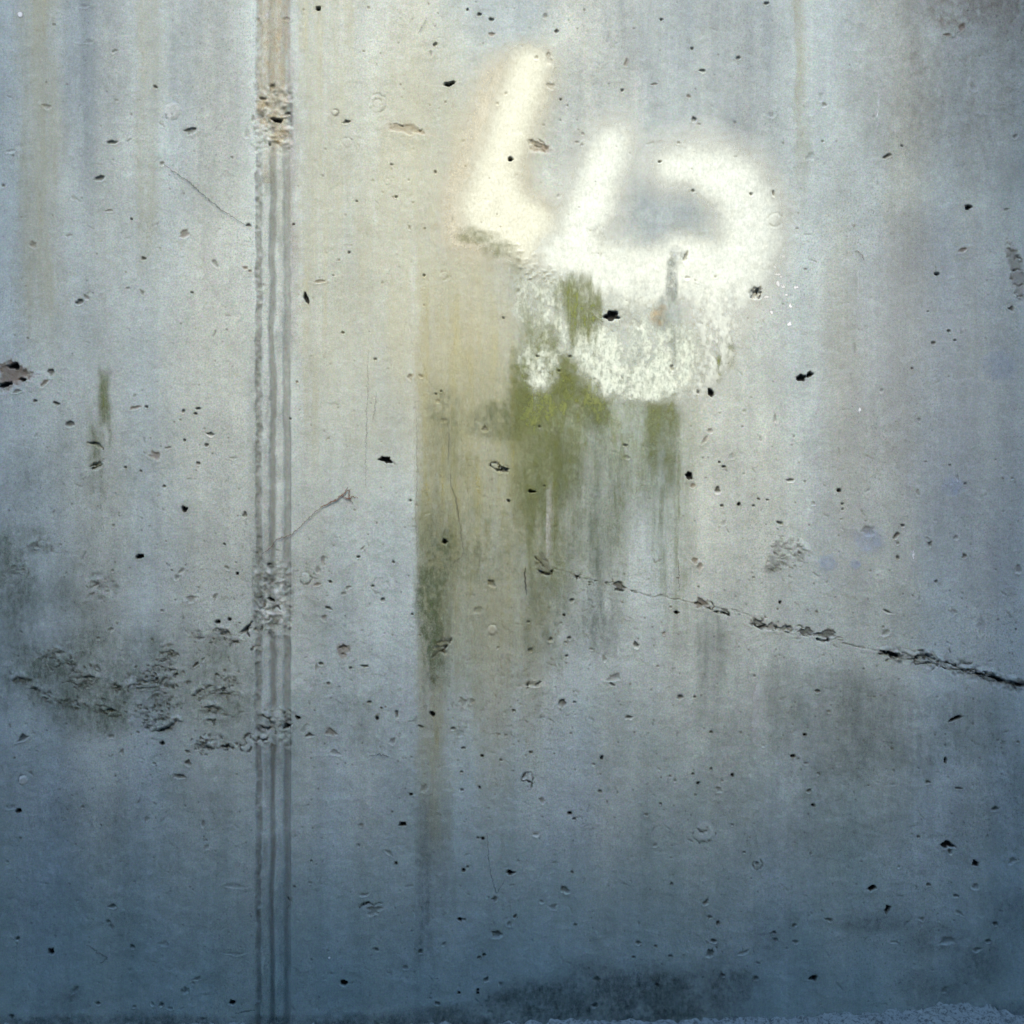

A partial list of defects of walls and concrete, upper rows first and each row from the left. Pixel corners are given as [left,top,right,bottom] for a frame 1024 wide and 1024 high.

spalling [255,76,291,163]
hole [0,358,35,392]
damp [581,377,609,424]
damp [649,391,676,460]
crack [524,552,1024,693]
spalling [16,644,291,754]